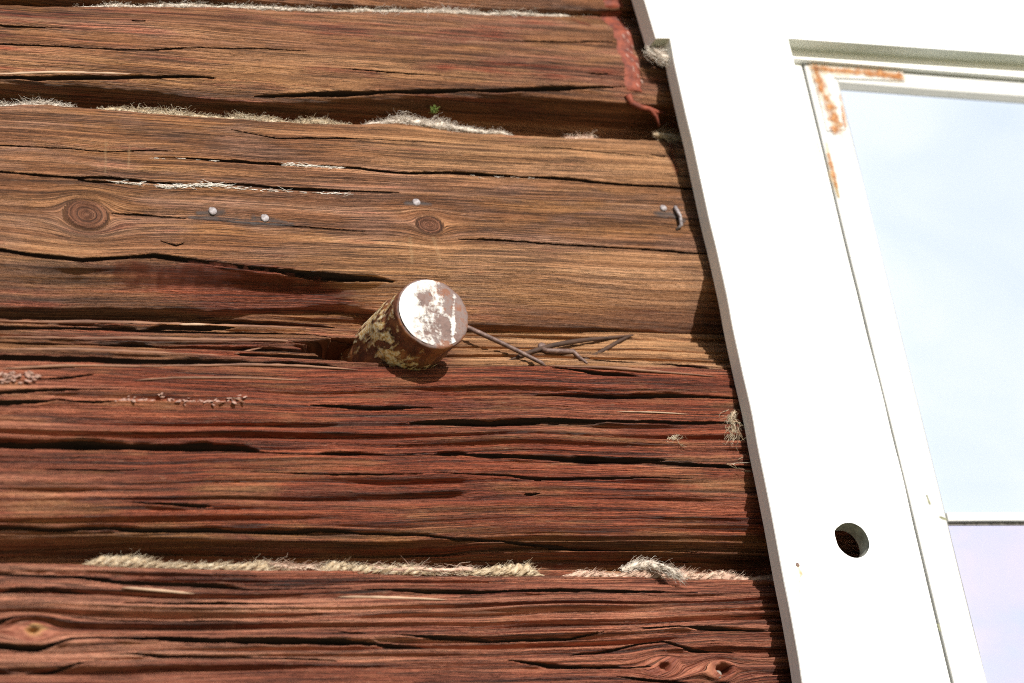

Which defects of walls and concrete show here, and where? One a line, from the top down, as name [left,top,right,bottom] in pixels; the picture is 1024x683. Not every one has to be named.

crack [0,74,215,82]
corrosion [813,65,902,133]
crack [0,129,693,193]
crack [0,213,394,283]
crack [460,239,708,255]
crack [0,441,752,496]